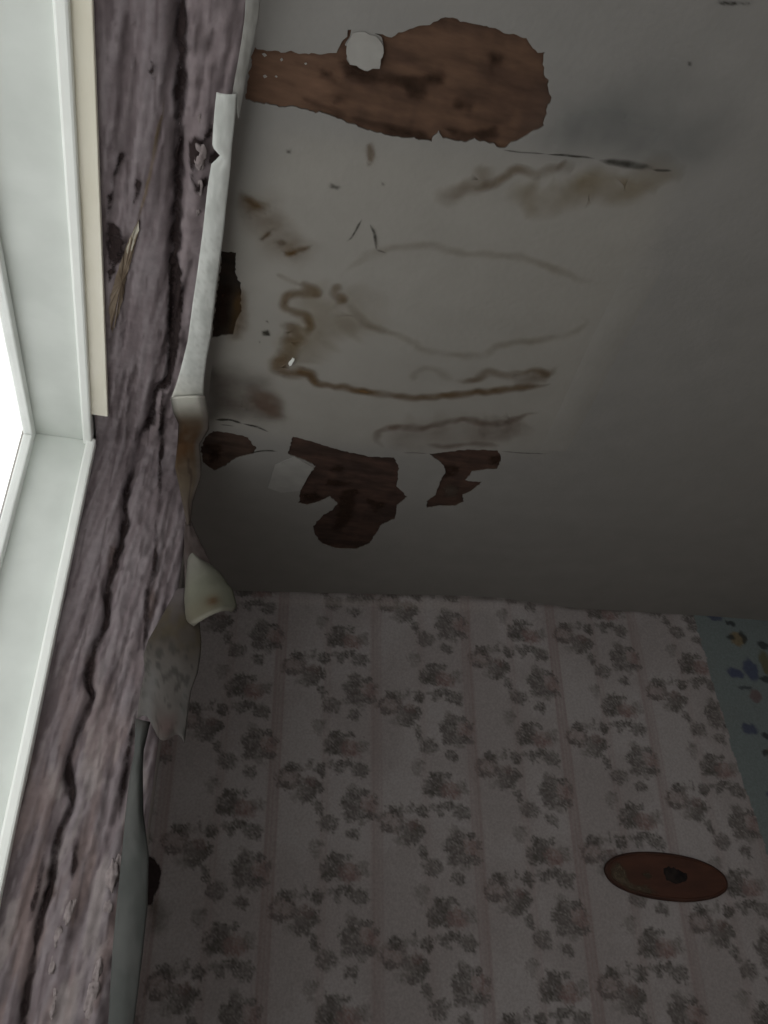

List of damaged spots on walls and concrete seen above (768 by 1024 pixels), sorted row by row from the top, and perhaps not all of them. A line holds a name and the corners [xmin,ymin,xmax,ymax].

peeling [245,17,551,147]
peeling [212,251,242,337]
damp [273,355,377,395]
damp [395,380,530,399]
peeling [201,431,256,470]
peeling [268,437,407,549]
peeling [426,449,501,507]